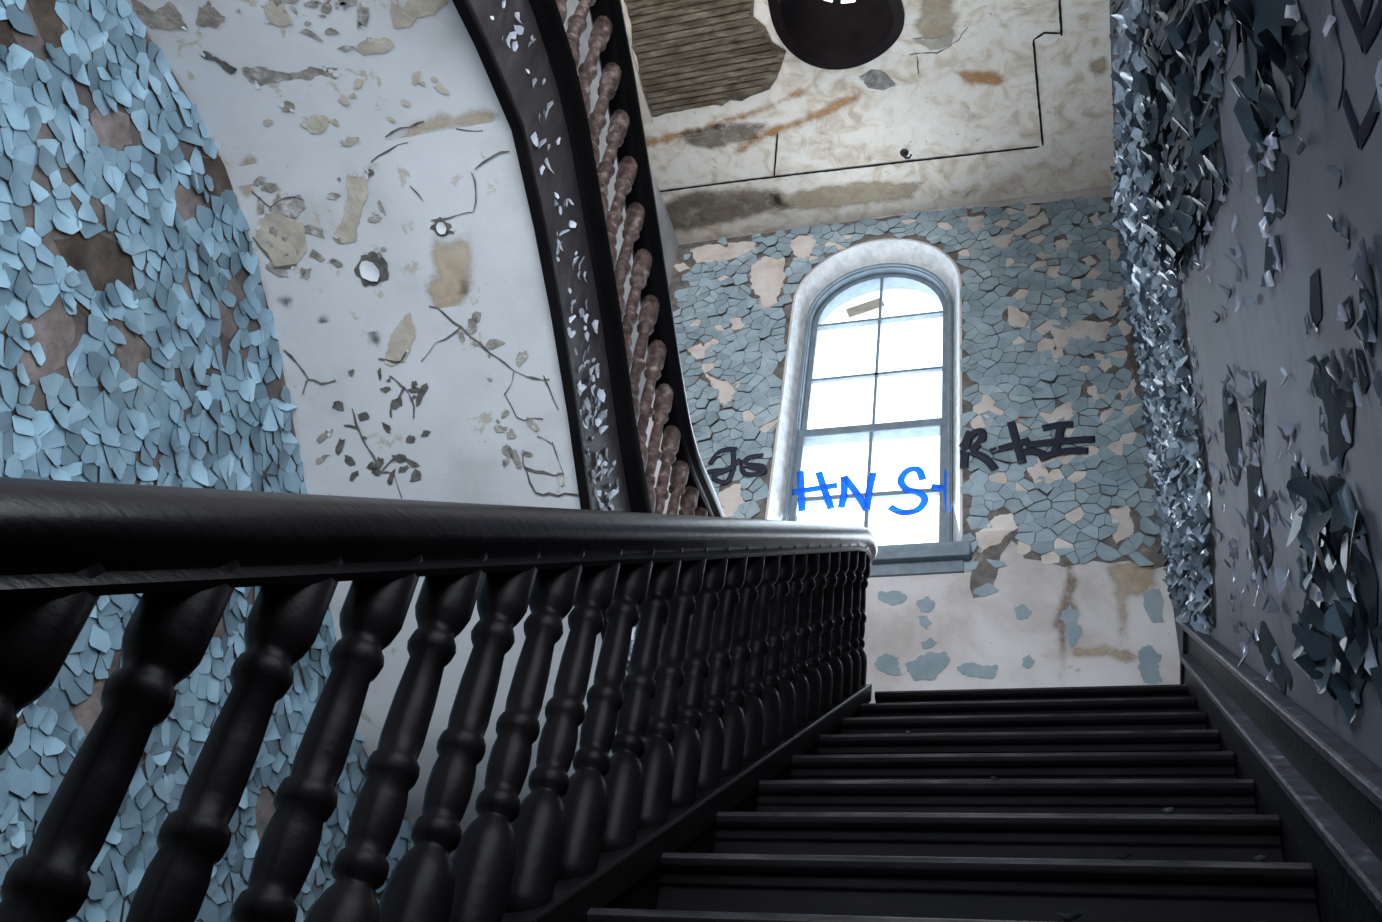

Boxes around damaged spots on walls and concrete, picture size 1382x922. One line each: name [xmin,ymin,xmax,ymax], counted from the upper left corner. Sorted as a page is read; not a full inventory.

peeling [0,0,449,494]
crack [371,121,424,163]
crack [283,306,579,498]
crack [410,128,510,221]
peeling [490,0,536,52]
peeling [554,192,619,511]
spalling [624,0,786,117]
peeling [669,0,1382,732]
peeling [0,593,143,903]
peeling [67,586,261,922]
peeling [195,607,337,922]
peeling [294,729,369,922]